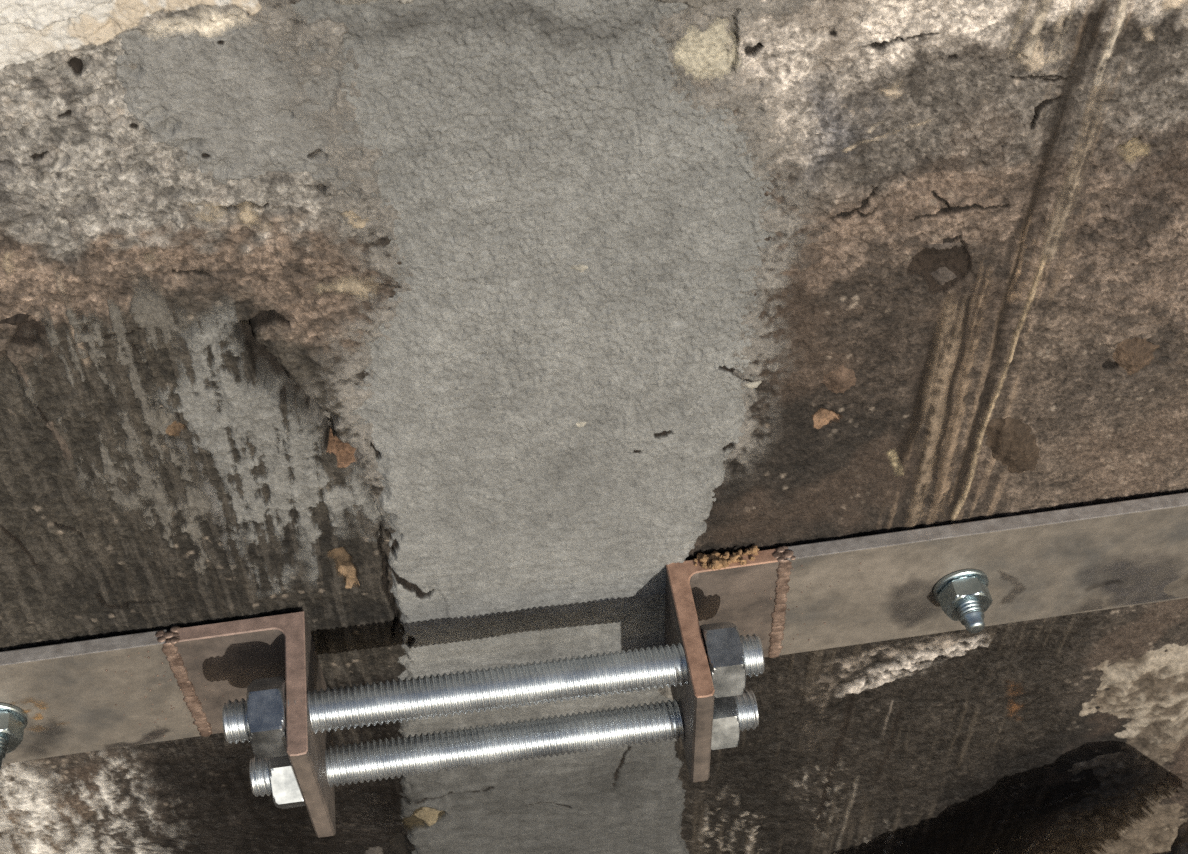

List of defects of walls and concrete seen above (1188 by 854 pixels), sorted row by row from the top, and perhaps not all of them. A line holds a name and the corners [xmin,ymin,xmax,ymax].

spalling [745,42,763,55]
spalling [67,57,83,75]
peeling [239,202,257,224]
crack [830,187,877,218]
crack [914,190,1009,220]
peeling [317,278,373,297]
crack [235,310,337,442]
crack [377,517,434,647]
damp [801,636,988,752]
damp [0,764,63,854]
damp [81,772,143,854]
damp [72,838,91,854]